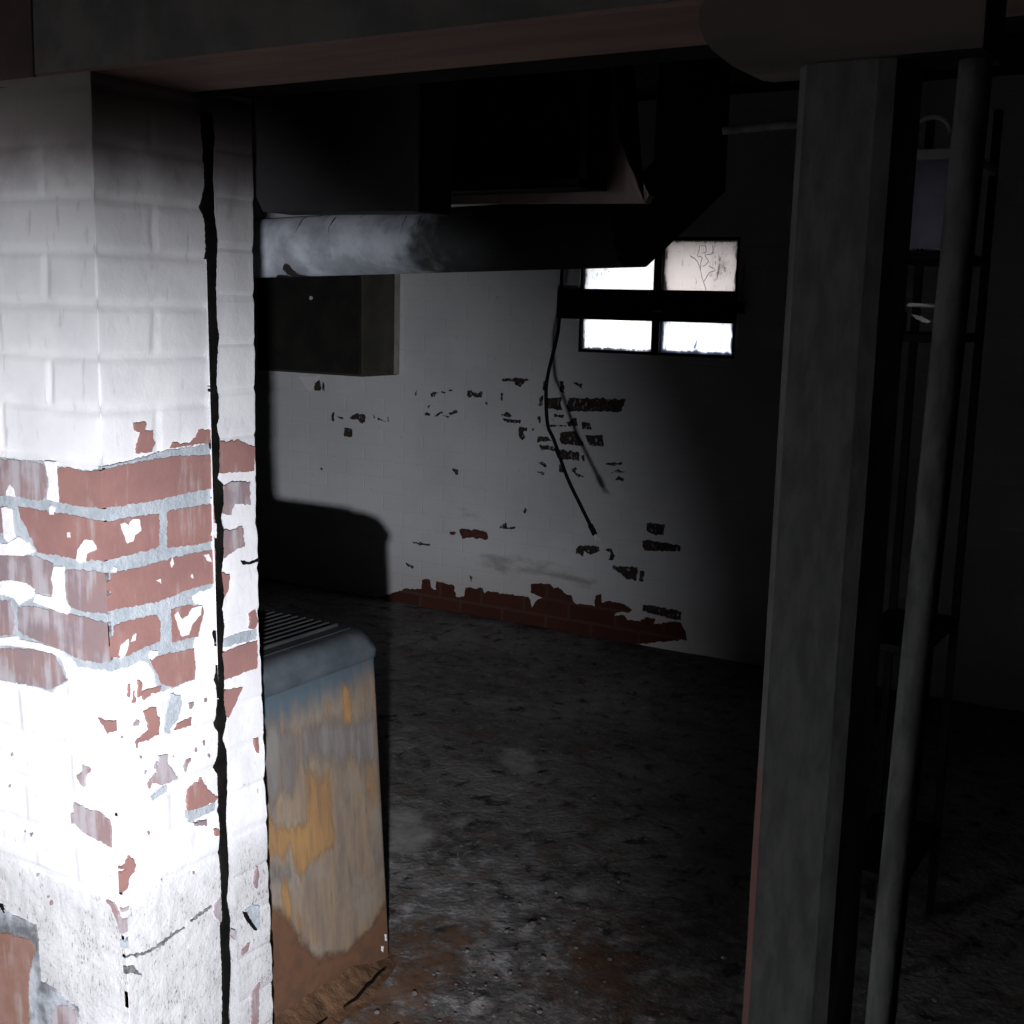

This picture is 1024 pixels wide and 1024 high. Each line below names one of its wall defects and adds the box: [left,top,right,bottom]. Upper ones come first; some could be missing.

peeling [331,412,389,437]
peeling [501,377,625,477]
crack [122,112,260,1024]
peeling [450,528,488,540]
peeling [576,545,645,582]
peeling [0,422,258,801]
peeling [379,575,687,645]
peeling [70,802,118,848]
peeling [184,777,220,836]
peeling [106,855,136,949]
peeling [214,897,250,956]
flaking render [0,909,80,1024]